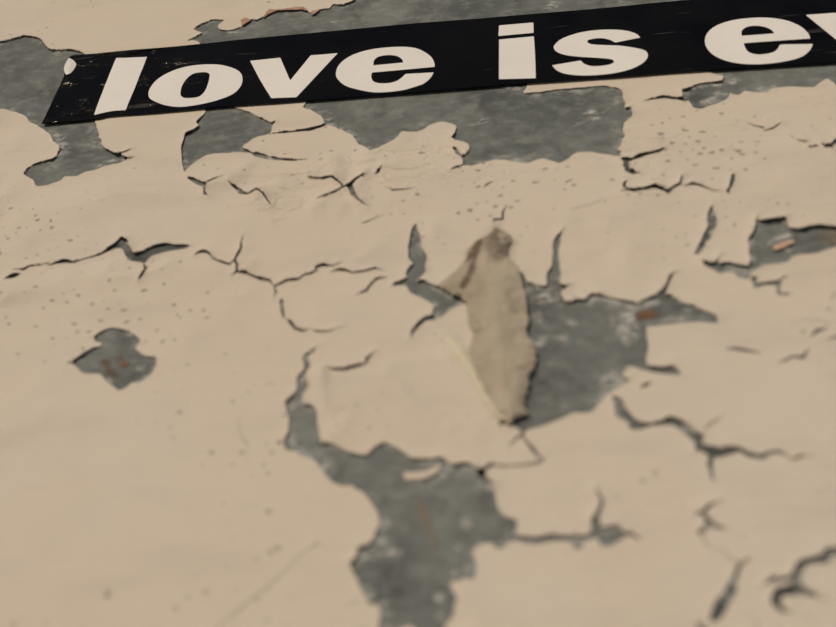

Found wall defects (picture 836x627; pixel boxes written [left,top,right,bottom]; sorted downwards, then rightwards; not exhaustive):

peeling [189,0,680,44]
peeling [0,32,135,187]
crack [1,233,382,332]
crack [303,162,384,223]
peeling [178,83,635,196]
peeling [389,224,724,430]
crack [618,145,737,255]
peeling [695,212,836,295]
peeling [280,343,642,627]
crack [610,395,811,549]
crack [696,559,750,627]
crack [758,544,836,612]